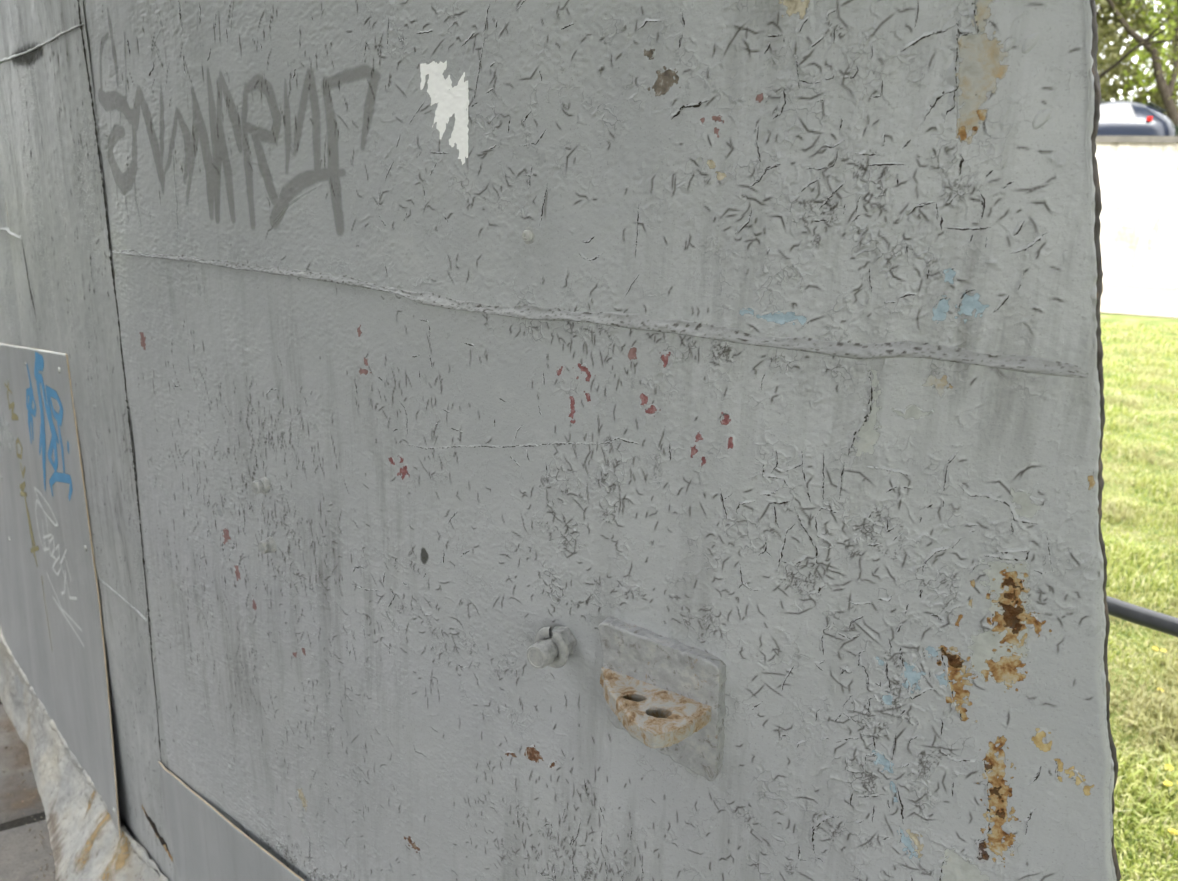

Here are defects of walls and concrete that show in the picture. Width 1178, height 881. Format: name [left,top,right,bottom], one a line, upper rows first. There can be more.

peeling [954,0,1011,147]
crack [355,317,639,475]
peeling [555,363,594,425]
peeling [639,388,660,419]
peeling [687,431,710,468]
peeling [720,412,736,451]
peeling [869,645,953,708]
rust [936,564,1052,723]
peeling [967,559,1036,690]
peeling [1031,727,1094,796]
rust [977,733,1021,867]